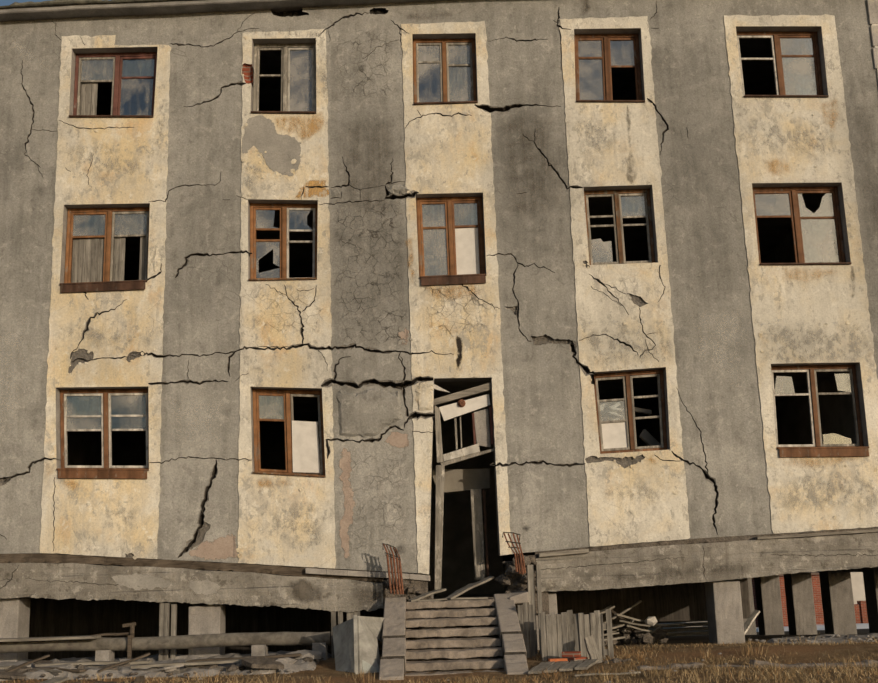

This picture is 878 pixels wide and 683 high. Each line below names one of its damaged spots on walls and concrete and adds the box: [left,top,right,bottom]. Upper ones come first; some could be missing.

crack [21,60,132,177]
spalling [242,63,253,84]
peeling [241,115,304,196]
crack [405,104,561,128]
crack [523,132,583,189]
spalling [67,349,94,375]
crack [70,157,454,459]
crack [461,253,555,342]
crack [569,265,666,376]
crack [5,457,56,551]
crack [149,456,250,558]
crack [541,389,719,579]